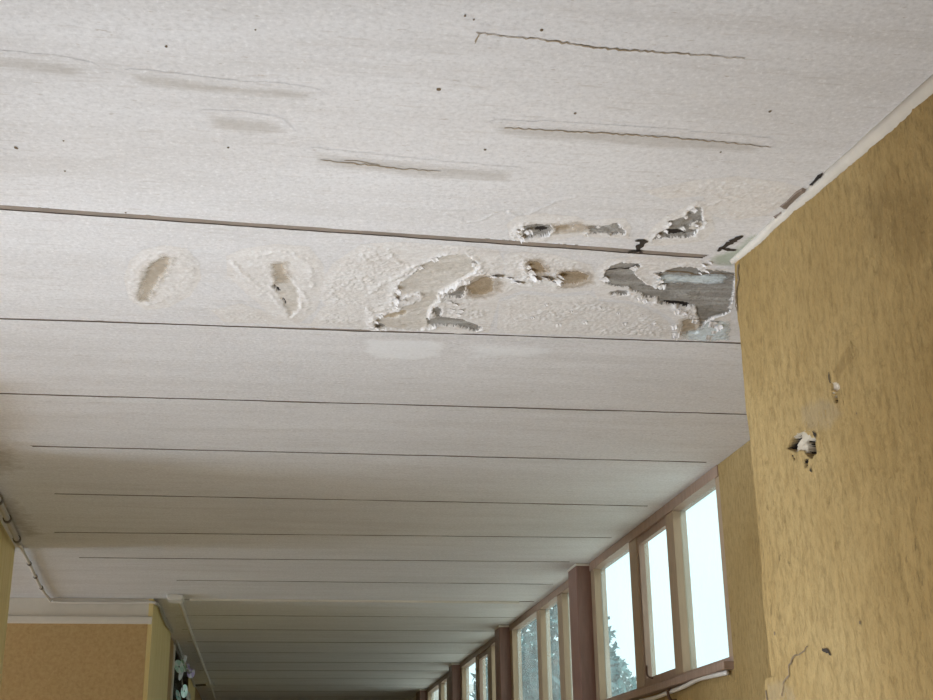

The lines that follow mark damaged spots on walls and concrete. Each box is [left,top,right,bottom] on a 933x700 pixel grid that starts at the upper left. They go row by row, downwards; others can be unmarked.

crack [475,32,744,59]
crack [504,128,771,148]
spalling [506,213,631,244]
spalling [643,200,715,246]
peeling [320,242,566,334]
spalling [592,256,735,341]
spalling [778,423,828,477]